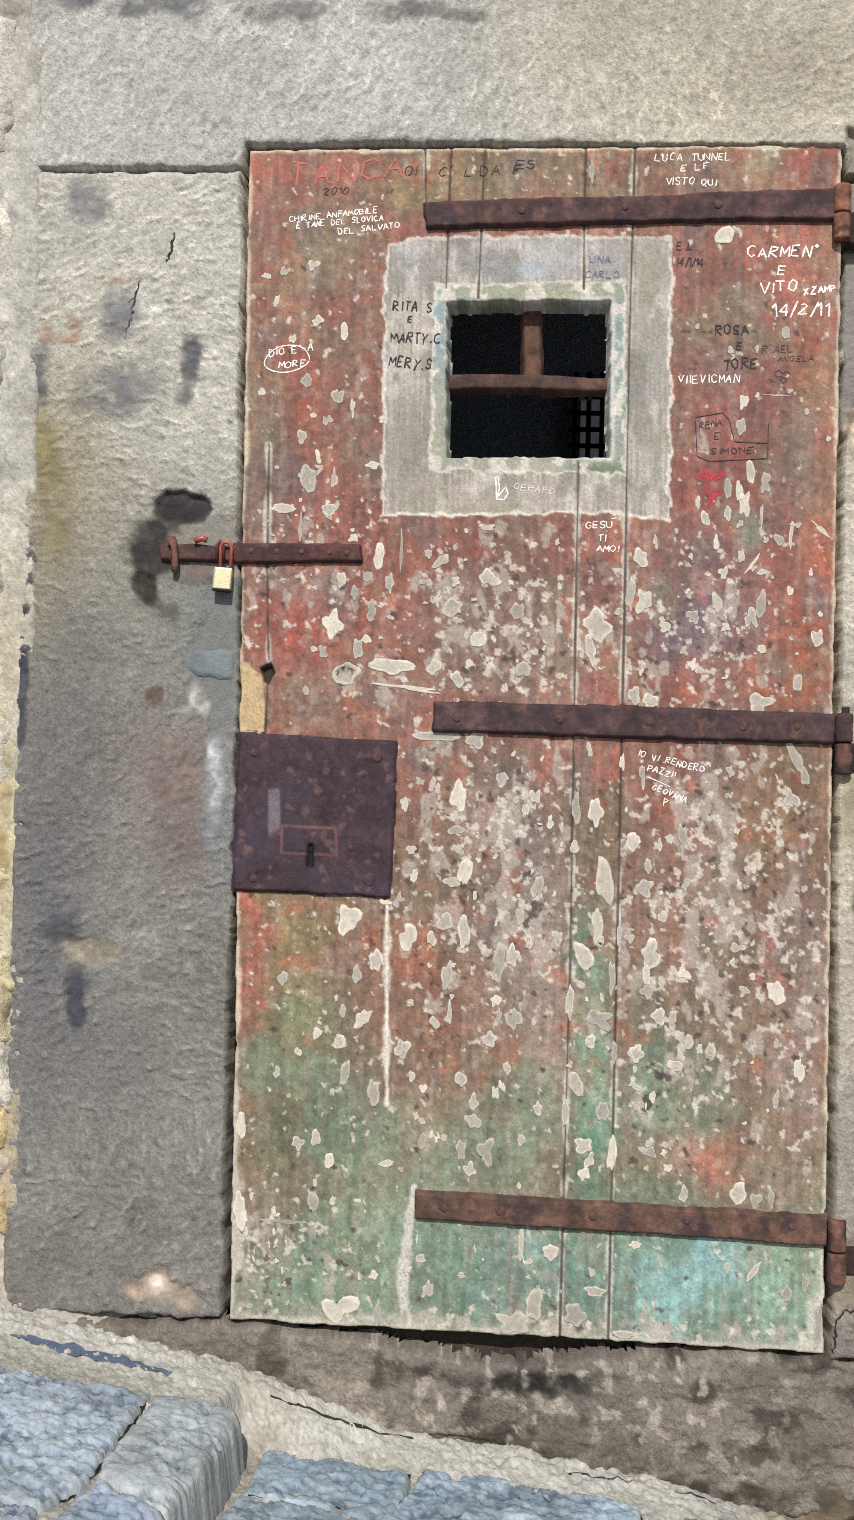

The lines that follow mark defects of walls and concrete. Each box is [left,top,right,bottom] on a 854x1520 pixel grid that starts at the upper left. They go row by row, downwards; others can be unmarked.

peeling [714,226,734,244]
peeling [739,460,771,518]
peeling [322,608,465,694]
peeling [572,791,605,828]
peeling [338,904,363,937]
peeling [399,923,418,952]
peeling [565,856,616,1033]
peeling [767,981,786,1006]
peeling [562,1071,617,1171]
peeling [232,1189,247,1234]
peeling [321,1295,360,1323]
peeling [495,1288,543,1335]